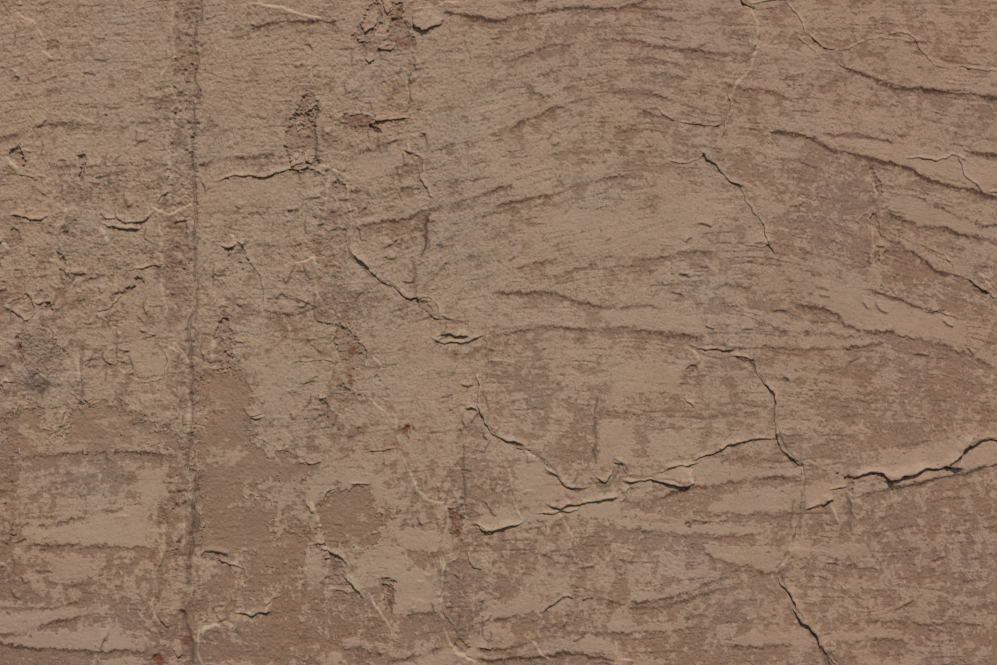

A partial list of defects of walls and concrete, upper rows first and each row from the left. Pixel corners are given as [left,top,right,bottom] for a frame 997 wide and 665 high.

crack [658,0,997,132]
crack [770,130,997,199]
spalling [0,290,53,321]
spalling [210,234,325,316]
crack [97,0,491,665]
crack [864,289,963,320]
crack [911,251,997,299]
peeling [0,317,401,665]
crack [364,342,997,665]